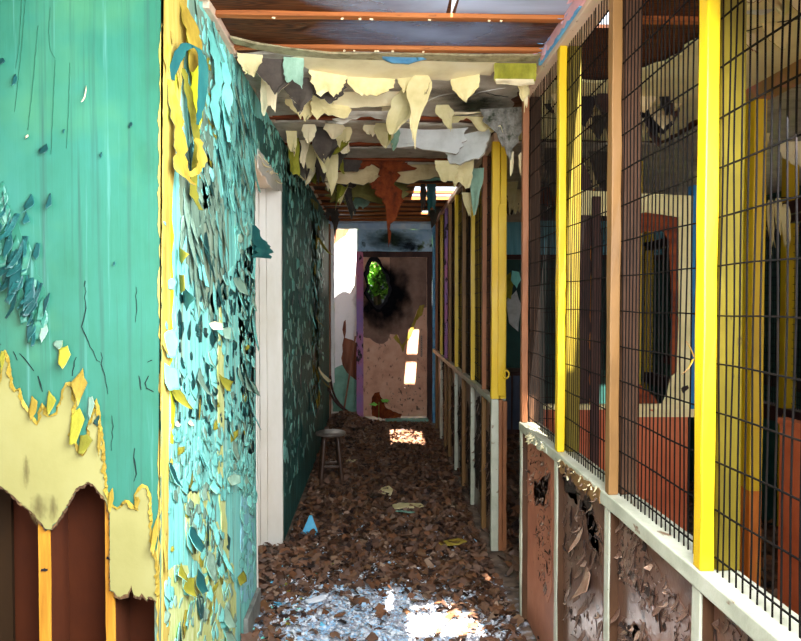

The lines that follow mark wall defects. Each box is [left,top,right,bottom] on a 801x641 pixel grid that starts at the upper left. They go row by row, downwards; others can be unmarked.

crack [14,0,70,149]
damp [372,231,421,251]
crack [72,281,108,393]
peeling [0,0,332,641]
peeling [519,432,691,641]
peeling [711,619,749,641]